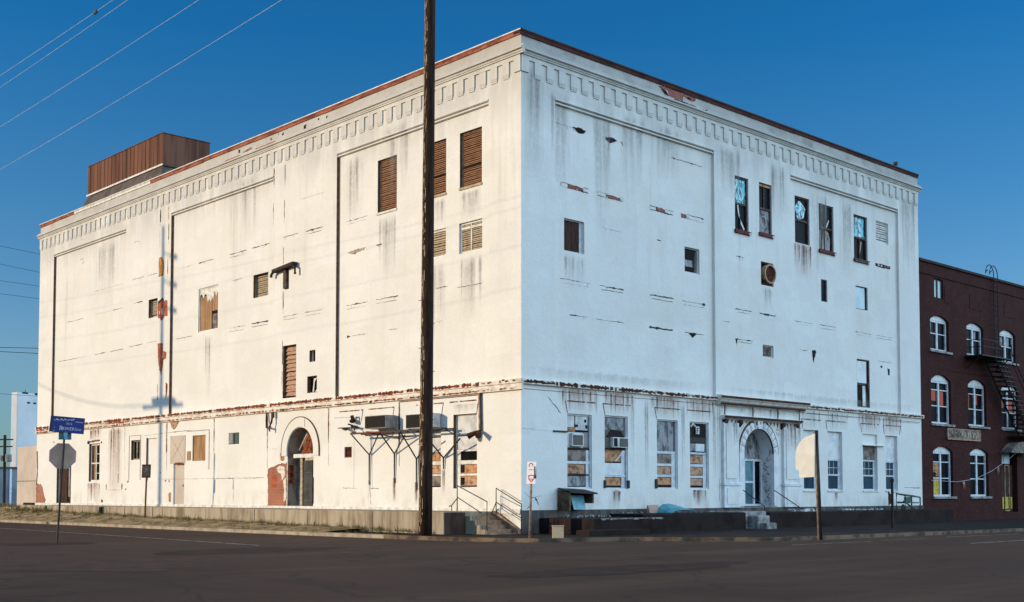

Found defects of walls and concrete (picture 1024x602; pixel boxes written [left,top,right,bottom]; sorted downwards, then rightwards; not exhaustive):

peeling [659,86,708,111]
spalling [563,182,623,202]
spalling [650,205,704,223]
peeling [267,453,287,506]